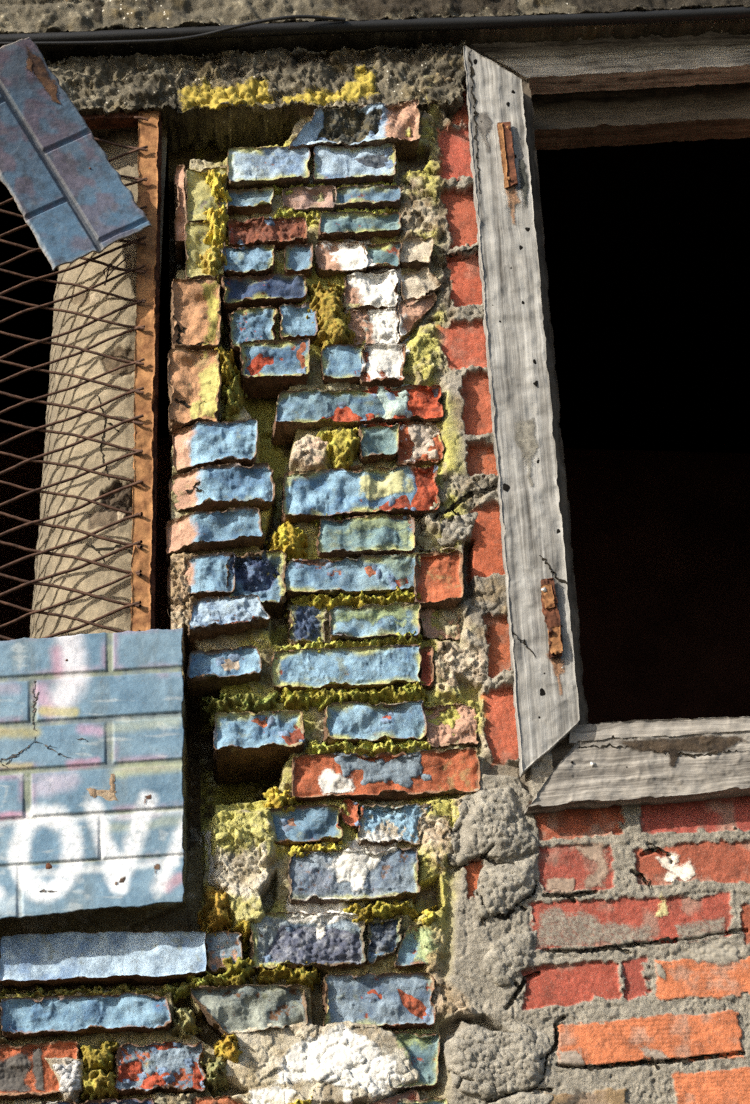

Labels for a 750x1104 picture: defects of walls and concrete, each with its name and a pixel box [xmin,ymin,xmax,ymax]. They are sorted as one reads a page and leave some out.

rust [506,185,520,223]
spalling [245,349,274,376]
spalling [296,335,307,373]
spalling [319,384,444,520]
crack [539,555,567,584]
crack [0,680,87,767]
peeling [334,749,431,788]
peeling [53,1060,83,1094]
spalling [115,1061,175,1089]
spalling [150,1041,205,1090]